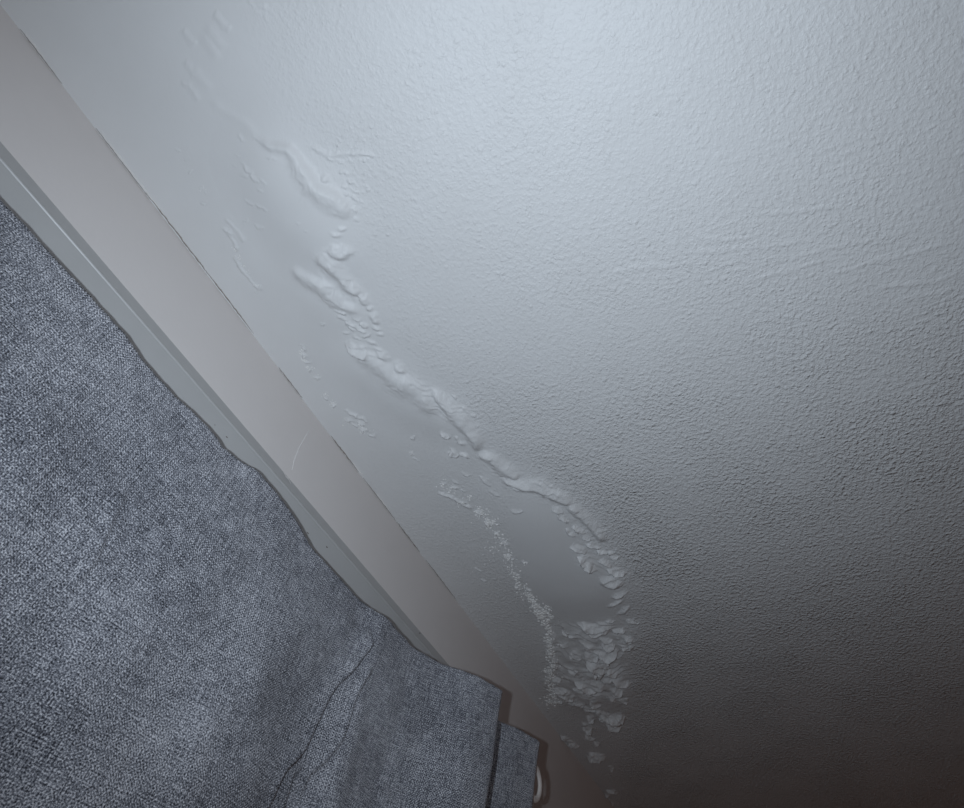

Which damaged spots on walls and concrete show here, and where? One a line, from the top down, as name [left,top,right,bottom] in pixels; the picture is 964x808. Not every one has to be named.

peeling [558,715,631,772]